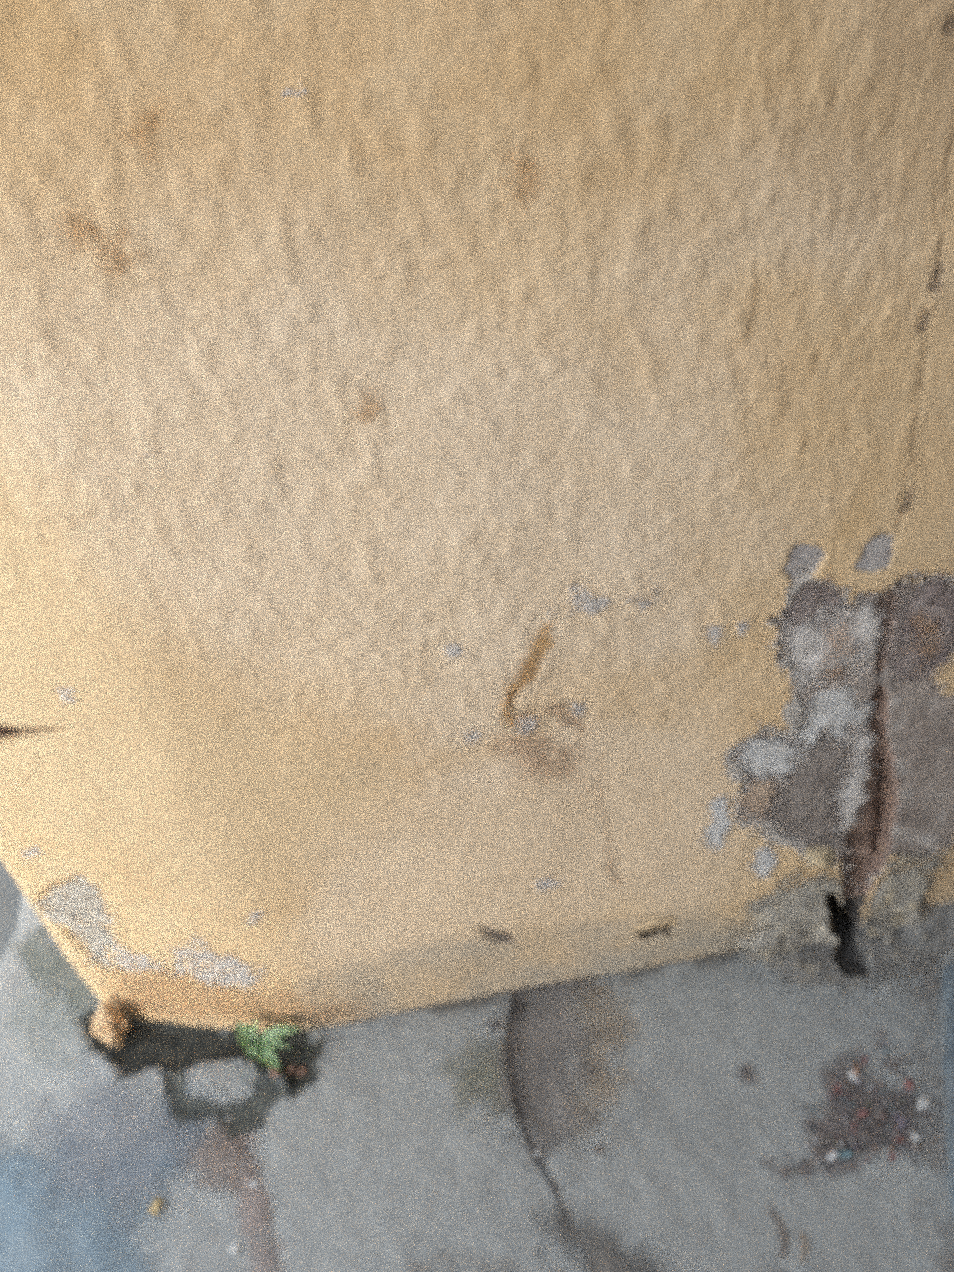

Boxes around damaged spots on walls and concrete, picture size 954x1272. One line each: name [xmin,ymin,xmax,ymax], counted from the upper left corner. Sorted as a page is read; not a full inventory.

flaking render [854,534,894,572]
corrosion [506,633,550,722]
flaking render [698,544,954,988]
crack [823,588,901,976]
peeling [36,874,265,991]